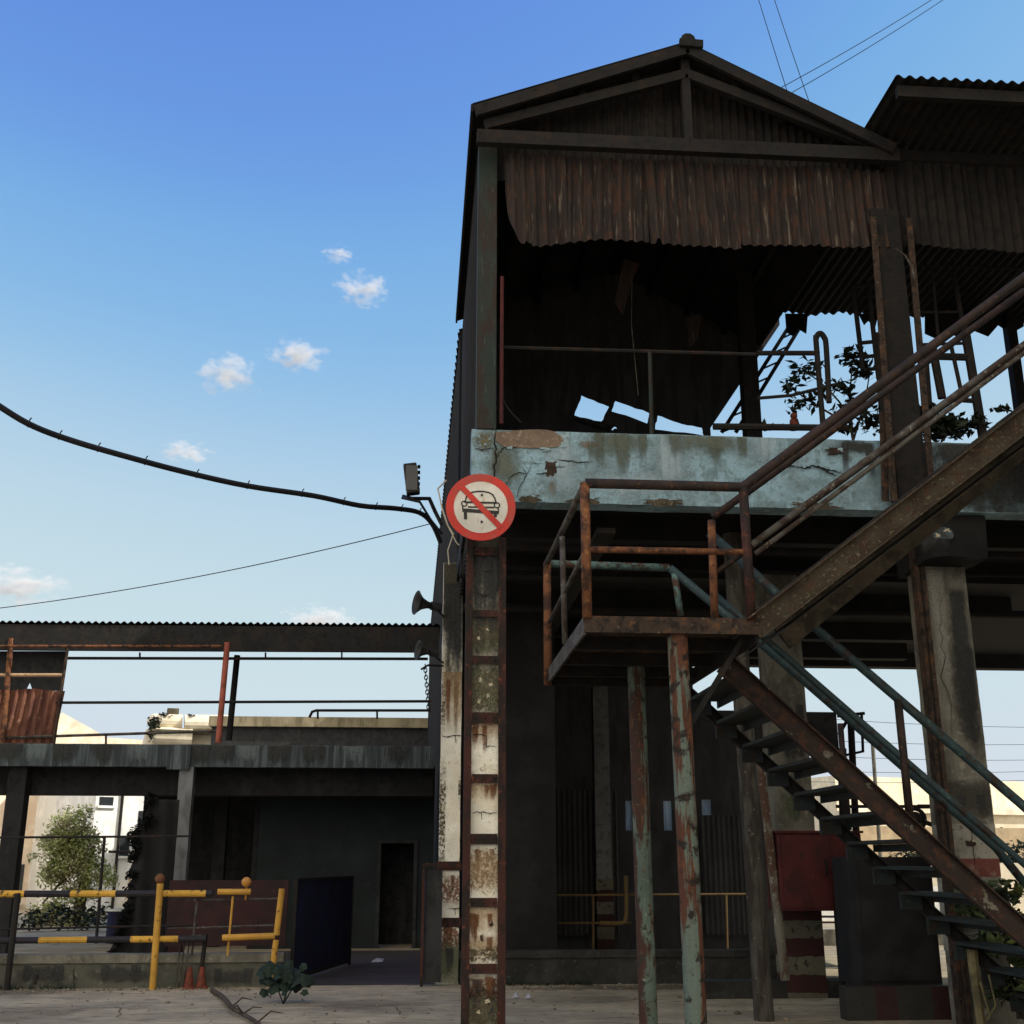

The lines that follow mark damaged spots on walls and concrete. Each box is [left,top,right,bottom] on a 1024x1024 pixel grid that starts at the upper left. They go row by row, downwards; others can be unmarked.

flaking render [473,429,569,477]
crack [475,432,588,496]
leakage [550,433,775,494]
crack [789,465,841,476]
corrosion [472,723,498,748]
corrosion [470,849,498,885]
corrosion [469,907,498,955]